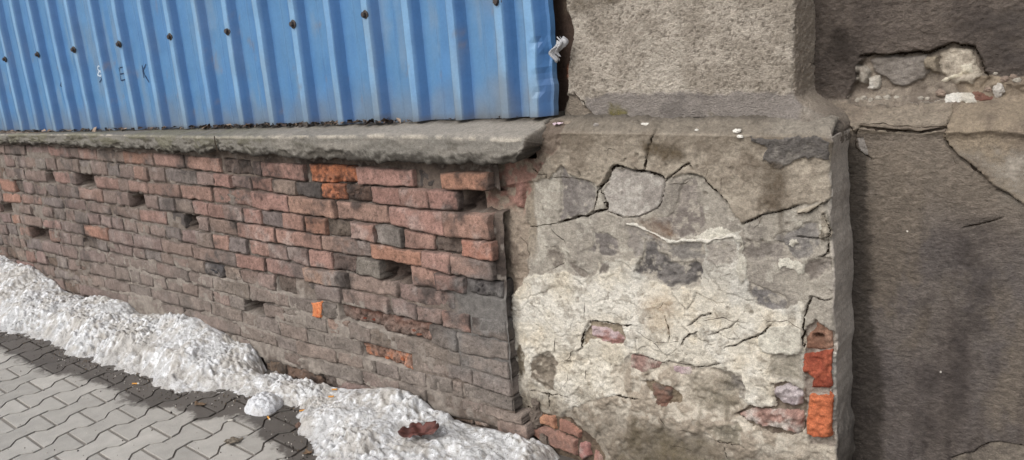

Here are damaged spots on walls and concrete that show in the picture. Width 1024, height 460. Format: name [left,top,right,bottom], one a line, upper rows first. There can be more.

flaking render [848,44,1022,108]
crack [851,102,1020,227]
crack [506,134,728,277]
crack [744,203,831,257]
flaking render [584,321,626,344]
flaking render [631,354,683,407]
crack [528,296,832,408]
flaking render [706,319,837,447]
flaking render [533,412,606,460]